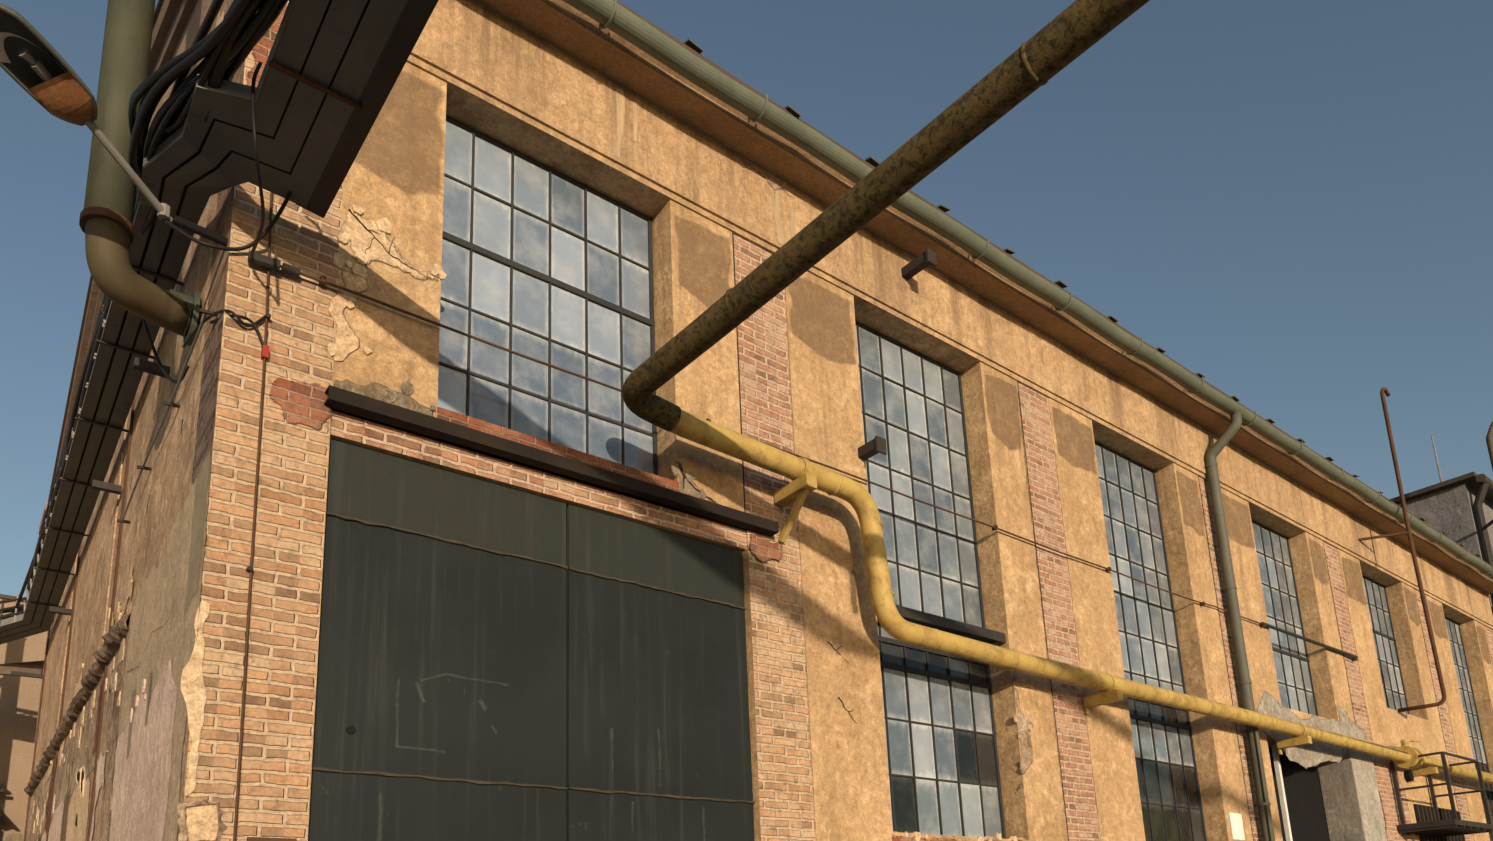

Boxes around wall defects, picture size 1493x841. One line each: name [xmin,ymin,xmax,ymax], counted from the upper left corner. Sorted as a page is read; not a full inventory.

peeling [269,205,447,430]
peeling [26,566,228,841]
spalling [888,831,1031,841]